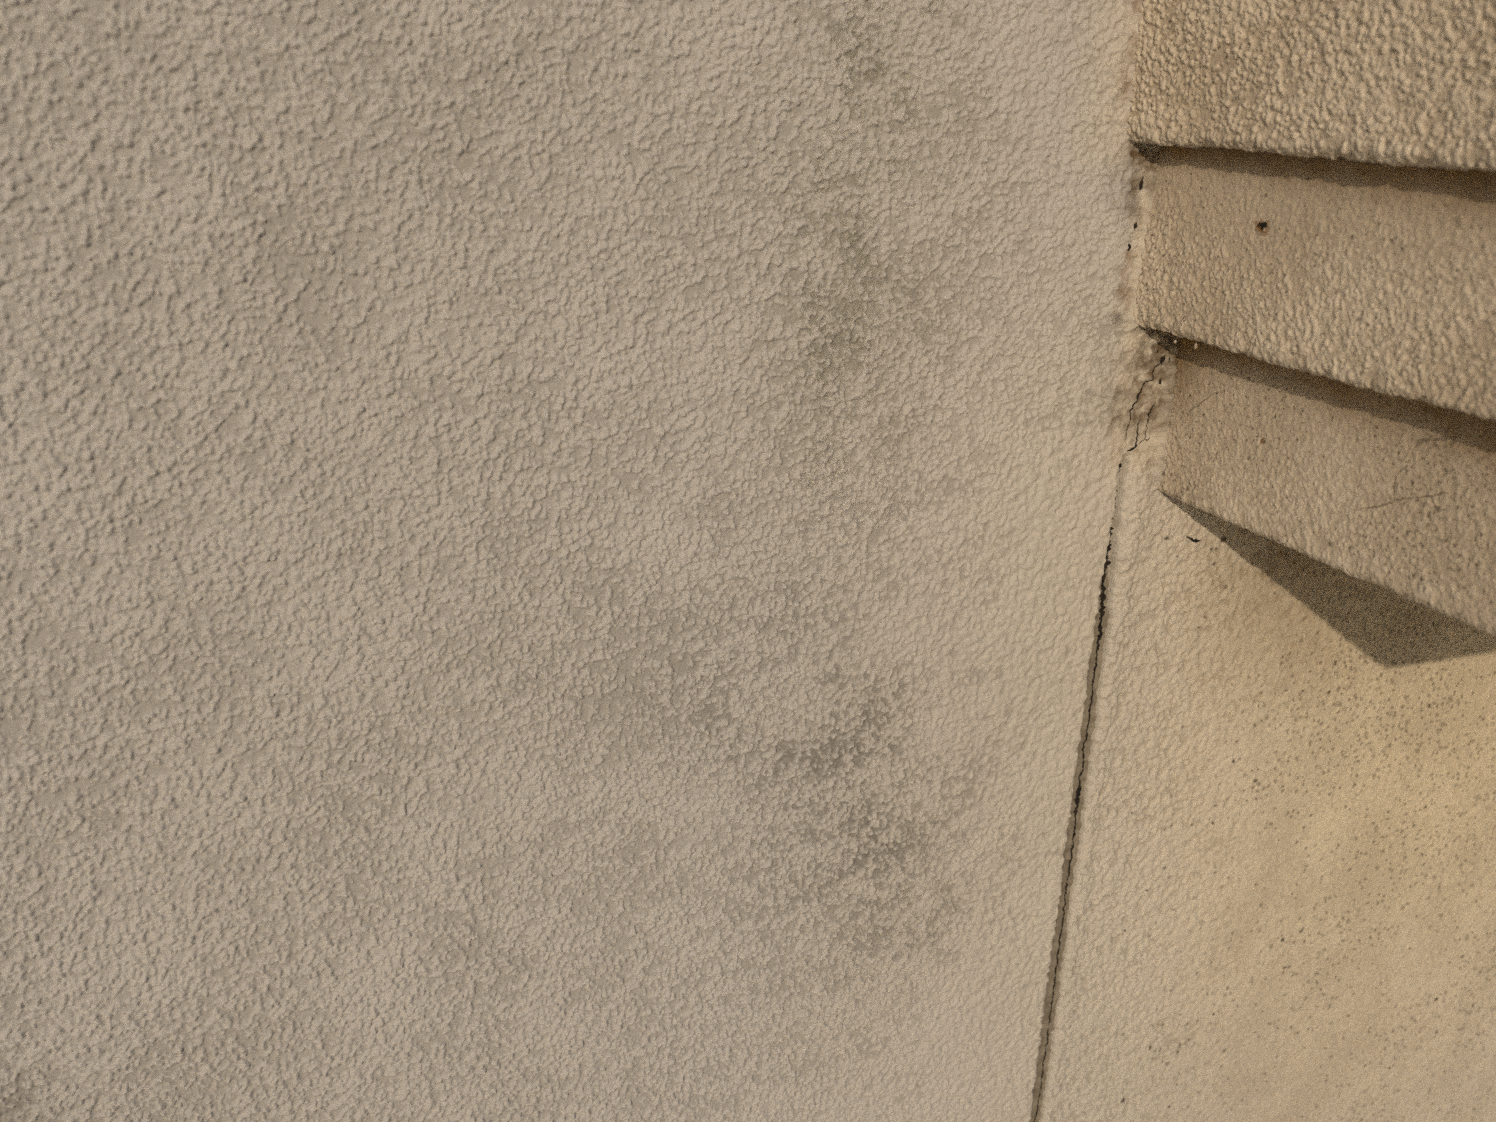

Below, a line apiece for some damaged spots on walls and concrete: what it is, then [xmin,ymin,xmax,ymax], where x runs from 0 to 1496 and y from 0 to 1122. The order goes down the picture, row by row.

crack [1034,365,1212,1122]